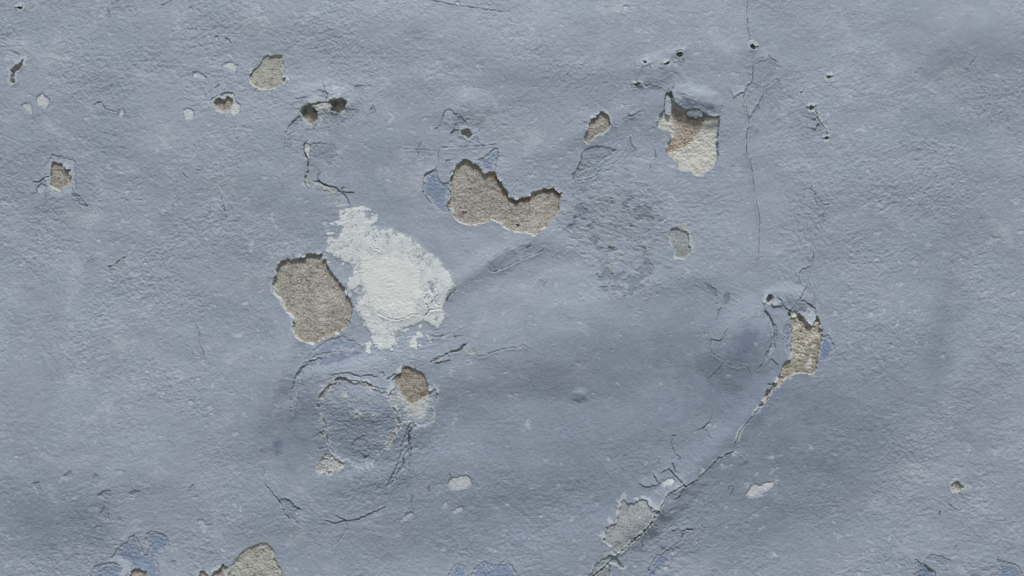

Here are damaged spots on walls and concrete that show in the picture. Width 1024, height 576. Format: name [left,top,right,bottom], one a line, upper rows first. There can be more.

spalling [36,154,88,209]
crack [291,116,354,199]
peeling [283,85,376,169]
spalling [422,148,563,237]
peeling [572,109,616,180]
spalling [655,88,721,177]
crack [734,4,781,266]
spalling [269,250,364,417]
spalling [759,291,836,408]
peeling [313,363,443,487]
crack [593,246,818,576]
spalling [585,492,661,576]